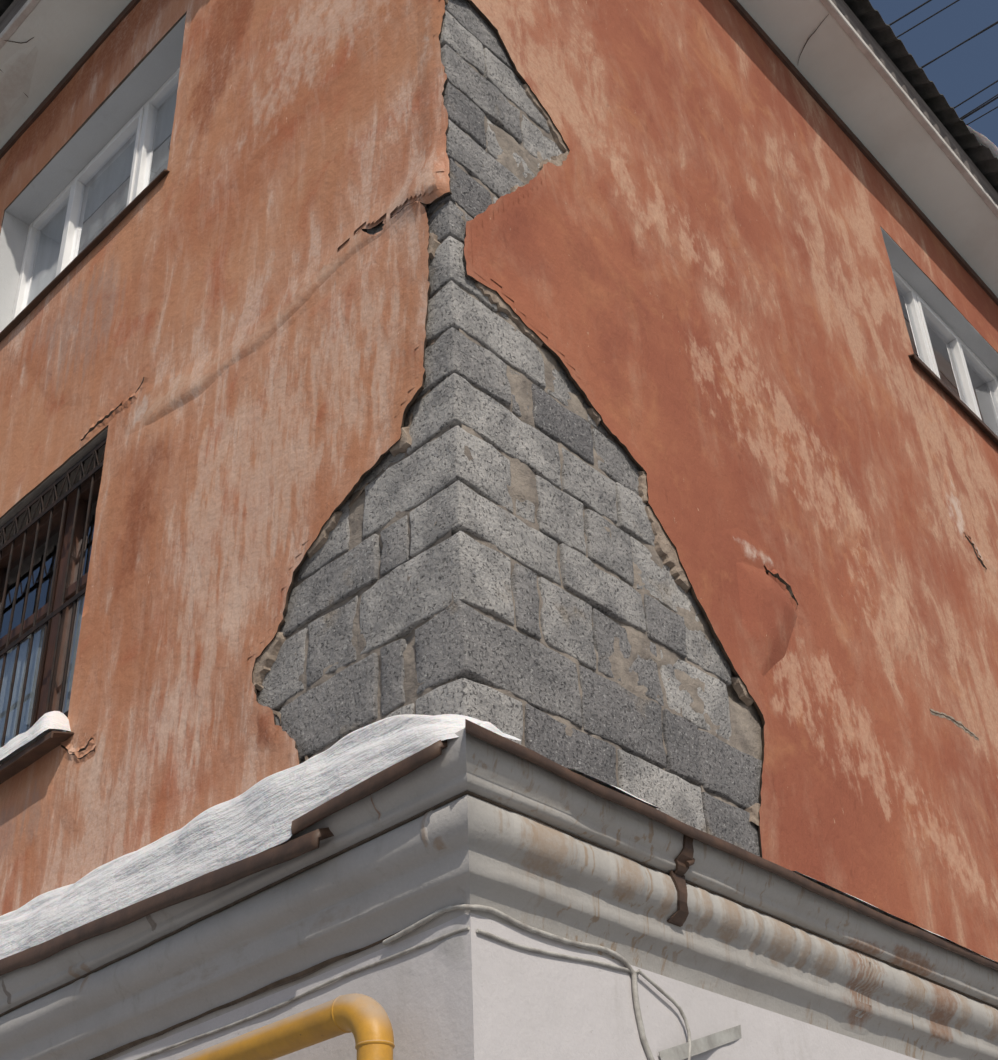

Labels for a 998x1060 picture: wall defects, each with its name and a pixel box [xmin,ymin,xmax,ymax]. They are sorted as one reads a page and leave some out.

crack [80,377,149,447]
flaking render [52,0,763,857]
peeling [591,133,924,671]
peeling [941,462,998,577]
crack [764,564,799,612]
peeling [763,626,998,933]
crack [0,790,998,1017]
damp [651,870,677,927]
damp [691,886,840,986]
crack [90,931,400,1060]
damp [897,969,930,1020]
damp [952,991,998,1047]